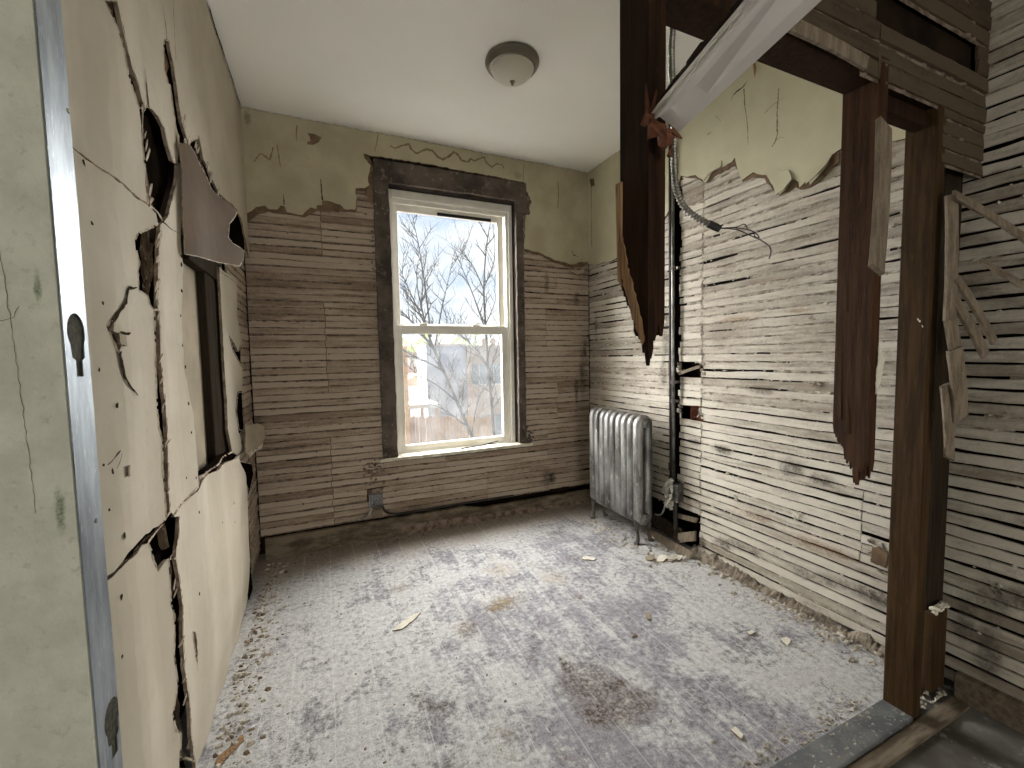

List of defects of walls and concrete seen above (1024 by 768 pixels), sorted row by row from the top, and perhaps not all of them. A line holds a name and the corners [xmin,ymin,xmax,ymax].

crack [210,9,241,106]
crack [707,83,784,147]
crack [80,153,179,234]
crack [374,134,505,169]
flaking render [767,169,792,195]
flaking render [805,152,833,184]
crack [111,286,138,395]
crack [107,520,165,580]